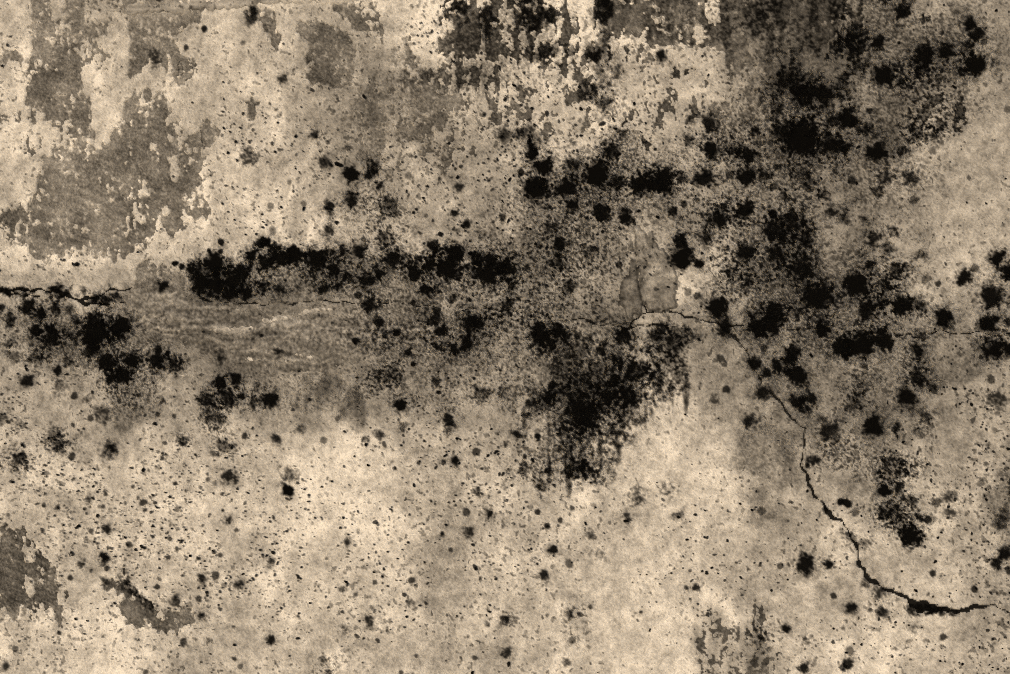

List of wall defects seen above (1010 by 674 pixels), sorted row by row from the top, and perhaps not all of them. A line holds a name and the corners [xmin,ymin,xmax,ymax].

peeling [0,0,222,295]
peeling [296,0,872,179]
peeling [896,60,968,135]
leakage [495,0,993,468]
crack [0,287,132,307]
leakage [0,283,184,388]
leakage [171,159,694,492]
leakage [956,249,1010,361]
crack [167,289,1010,616]
leakage [873,450,956,549]
peeling [0,522,69,628]
peeling [100,568,196,636]